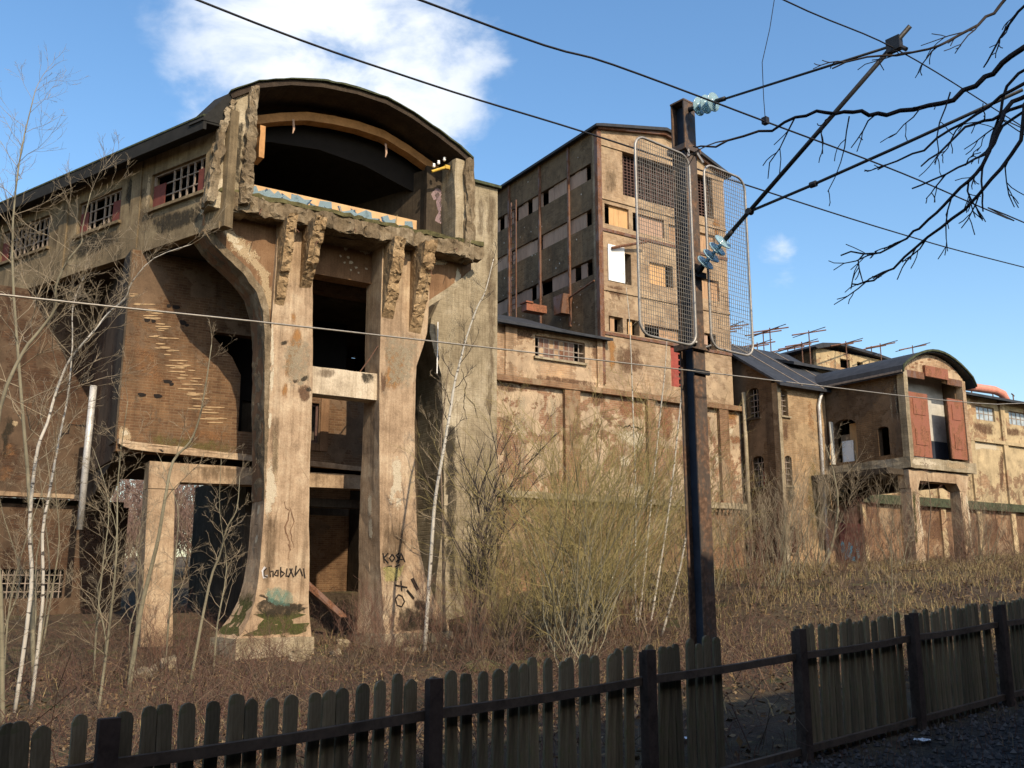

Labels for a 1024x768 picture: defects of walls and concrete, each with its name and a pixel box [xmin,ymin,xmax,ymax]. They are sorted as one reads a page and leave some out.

spalling [129,293,227,423]
spalling [270,324,310,401]
peeling [257,413,279,517]
leakage [975,423,992,434]